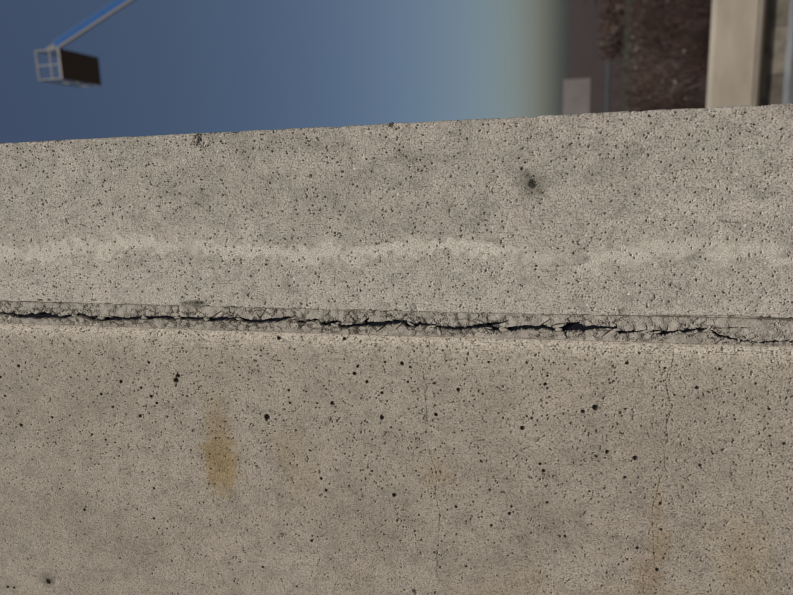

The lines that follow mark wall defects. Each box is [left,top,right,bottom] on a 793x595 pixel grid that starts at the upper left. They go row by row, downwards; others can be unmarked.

crack [1,312,793,590]